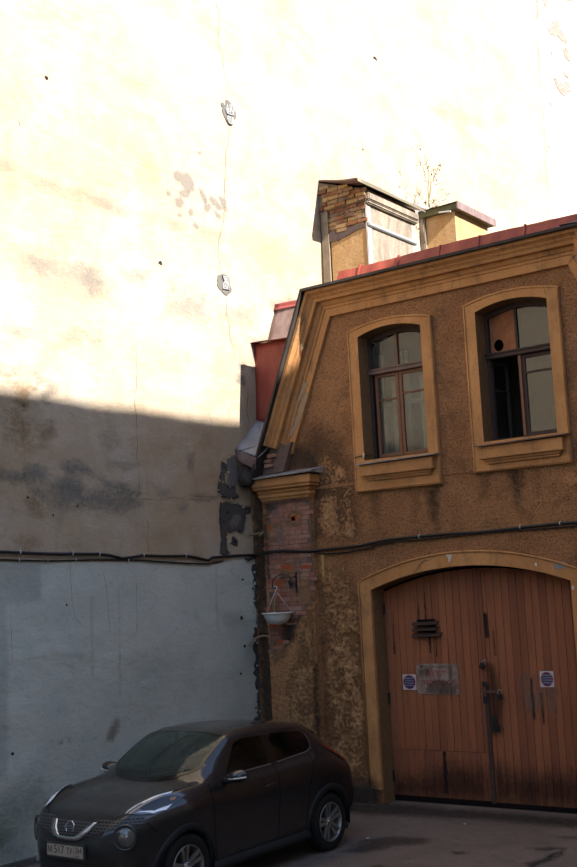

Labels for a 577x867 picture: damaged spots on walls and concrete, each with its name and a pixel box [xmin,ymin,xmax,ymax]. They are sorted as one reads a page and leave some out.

flaking render [217,455,251,556]
peeling [242,455,368,778]